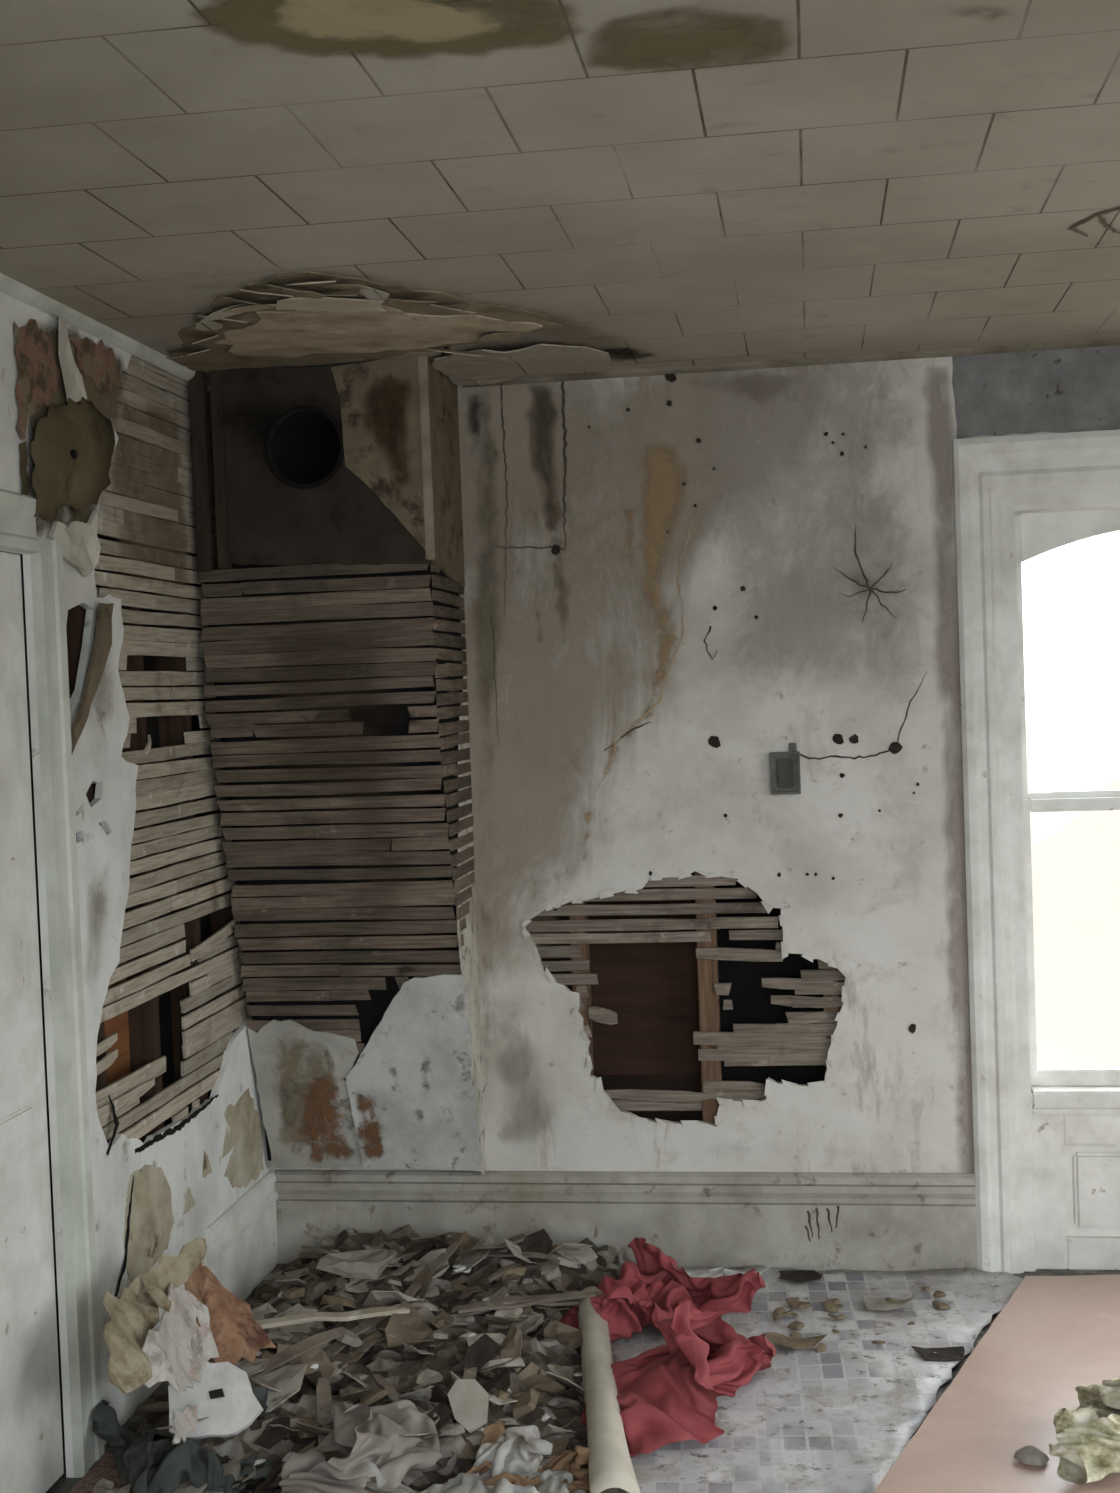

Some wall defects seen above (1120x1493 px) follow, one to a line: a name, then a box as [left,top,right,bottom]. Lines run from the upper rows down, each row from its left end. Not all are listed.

water stain [199,0,574,58]
water stain [594,11,786,69]
flaking render [48,281,389,1143]
water stain [458,349,816,959]
crack [833,527,906,623]
spalling [521,871,847,1127]
peeling [115,1088,264,1297]
corrosion [300,1077,385,1162]